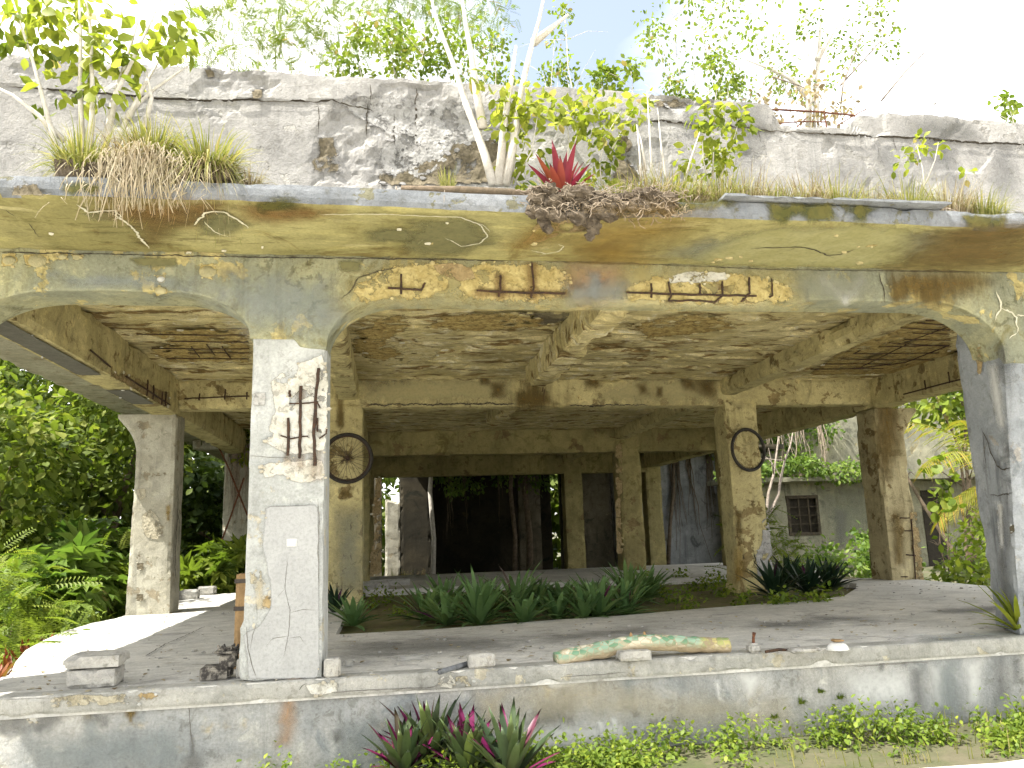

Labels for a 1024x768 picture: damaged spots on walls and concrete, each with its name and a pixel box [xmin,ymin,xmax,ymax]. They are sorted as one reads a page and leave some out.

water stain [86,212,115,221]
water stain [202,213,243,234]
crack [4,205,507,299]
spalling [354,223,934,339]
crack [535,245,975,299]
crack [995,292,1024,339]
spalling [258,355,331,483]
water stain [876,407,899,476]
crack [271,504,320,579]
water stain [895,513,903,563]
crack [246,560,307,678]